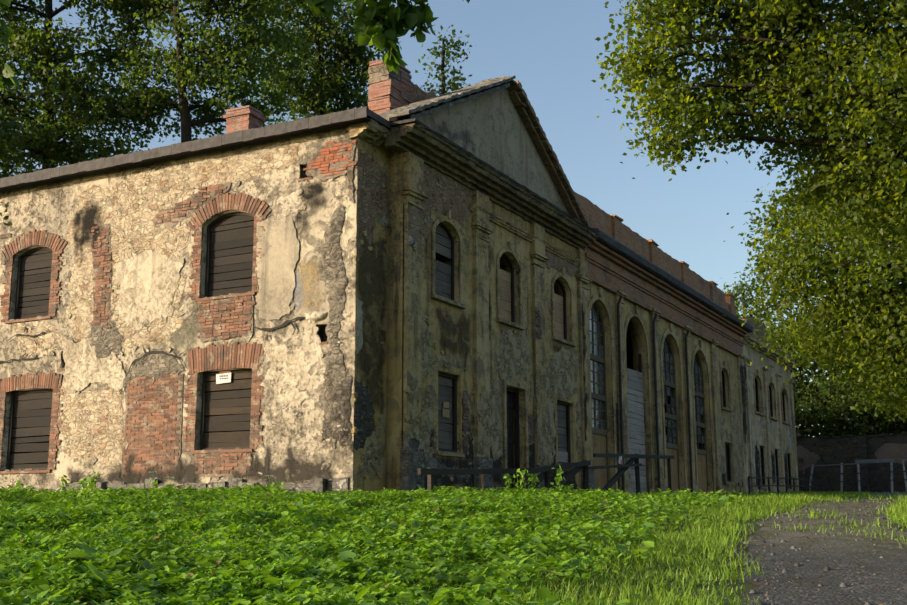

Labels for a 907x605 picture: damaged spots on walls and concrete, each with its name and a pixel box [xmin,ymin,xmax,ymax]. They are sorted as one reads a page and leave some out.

flaking render [0,233,11,268]
crack [0,330,53,362]
flaking render [13,138,388,483]
crack [253,316,306,340]
leakage [436,308,470,368]